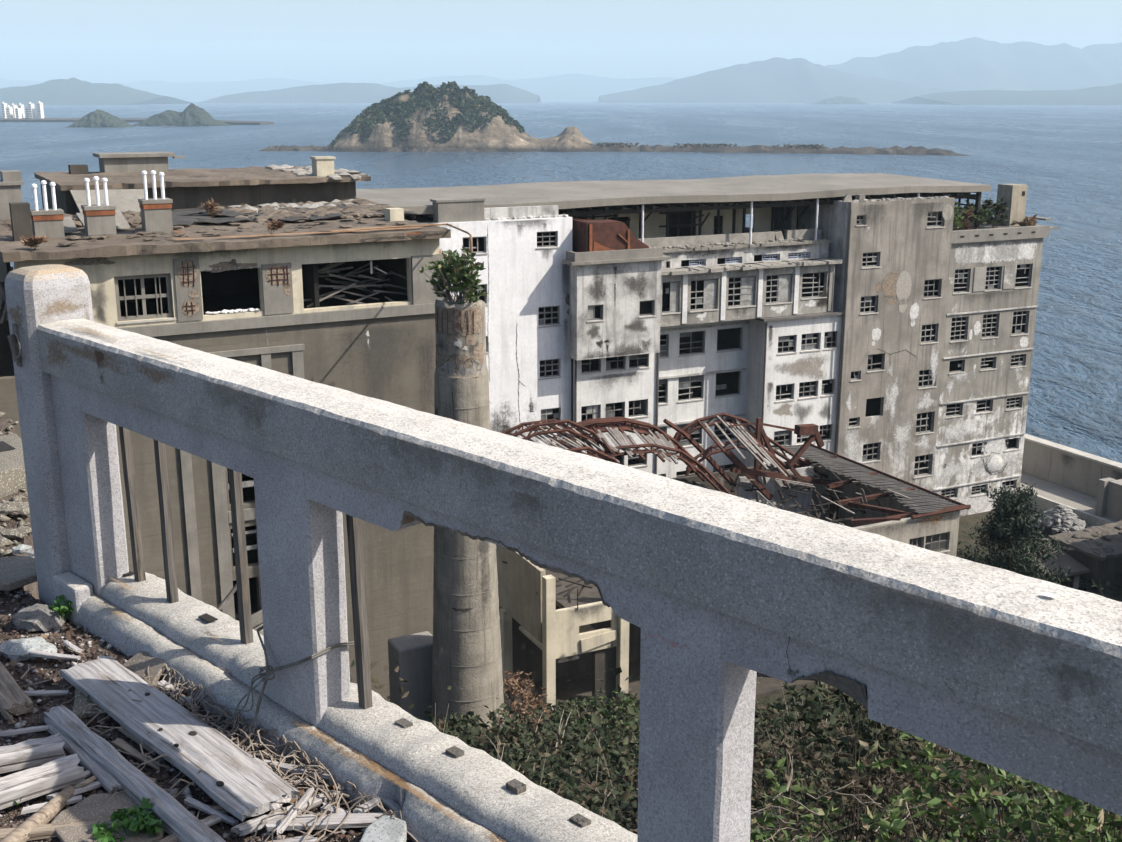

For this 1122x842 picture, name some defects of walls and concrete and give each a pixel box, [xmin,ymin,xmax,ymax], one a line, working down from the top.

leakage [585,267,647,300]
spalling [875,271,919,327]
leakage [586,320,650,358]
spalling [872,328,882,346]
leakage [776,357,824,378]
leakage [768,383,830,420]
peeling [971,439,1019,475]
peeling [950,487,1007,513]
spalling [400,510,610,607]